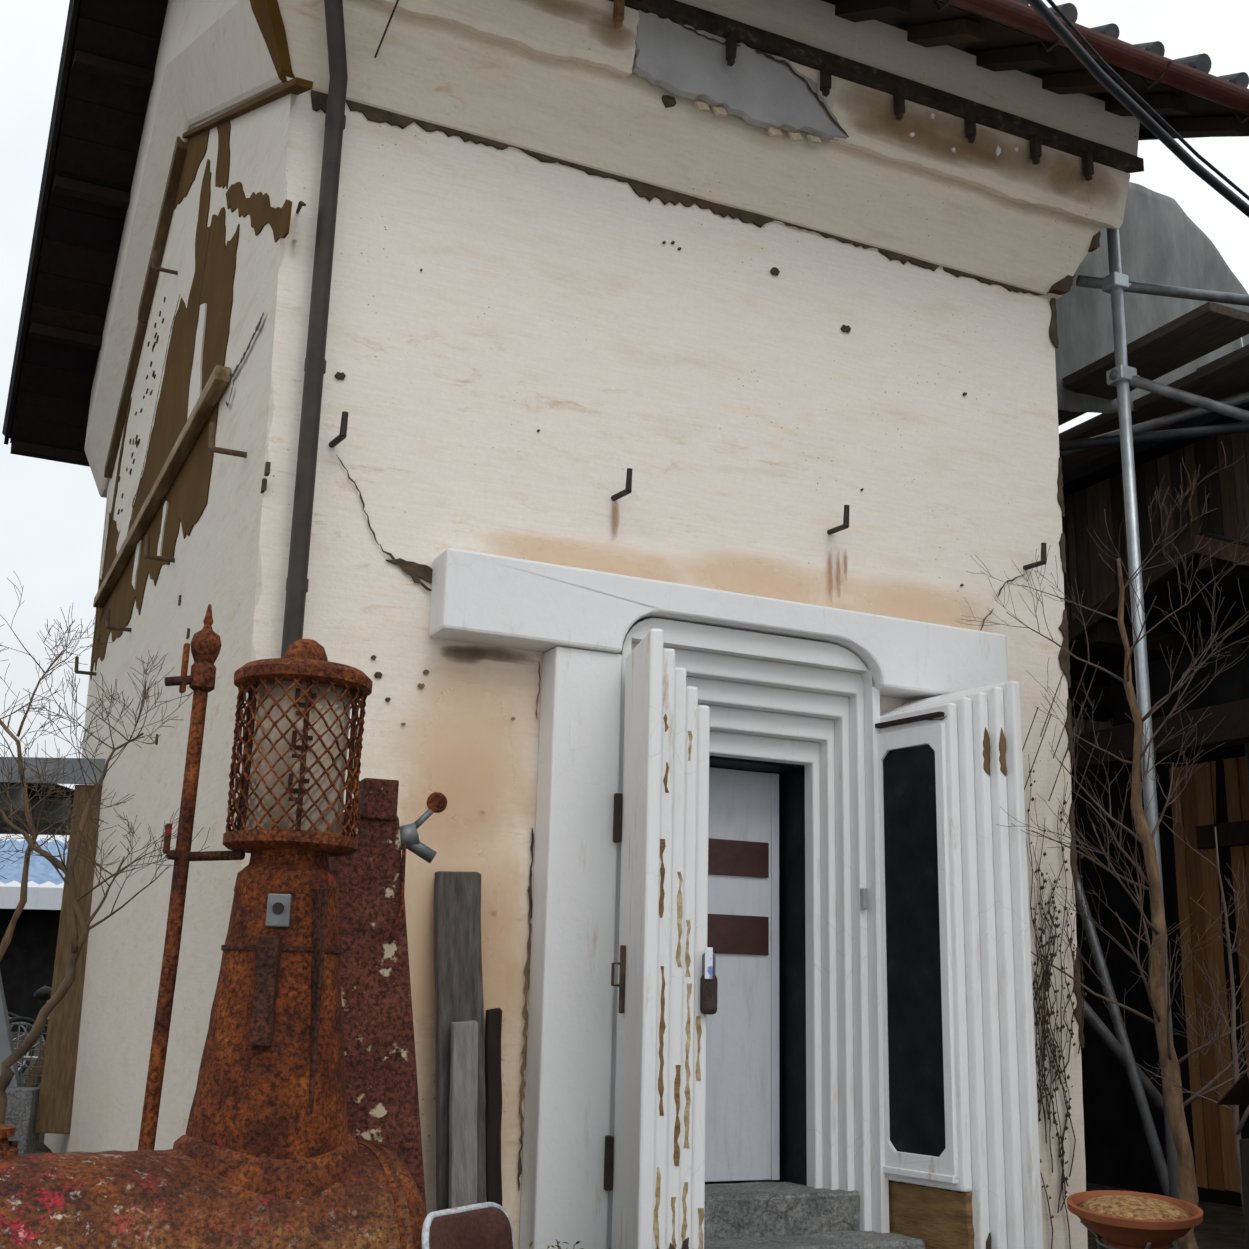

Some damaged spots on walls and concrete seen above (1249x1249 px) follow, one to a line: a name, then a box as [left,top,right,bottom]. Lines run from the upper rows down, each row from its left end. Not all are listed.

peeling [311,90,328,113]
spalling [632,10,848,144]
peeling [346,100,1075,348]
spalling [1088,231,1101,252]
peeling [90,120,306,680]
crack [337,456,432,591]
corrosion [828,553,847,596]
spalling [1057,457,1065,517]
spalling [1058,609,1073,756]
spalling [1069,803,1079,898]
peeling [658,839,702,1166]
peeling [653,1167,704,1249]